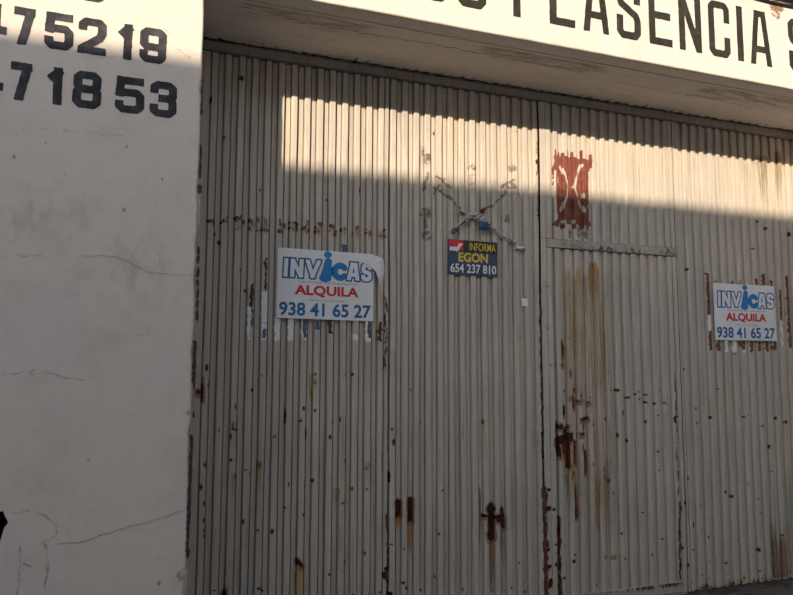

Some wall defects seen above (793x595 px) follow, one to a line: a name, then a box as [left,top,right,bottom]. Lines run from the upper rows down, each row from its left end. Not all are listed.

corrosion [206,215,386,245]
corrosion [539,263,599,595]
spalling [0,511,8,541]
crack [45,510,183,547]
corrosion [379,496,415,595]
corrosion [478,489,506,591]
corrosion [604,376,712,592]